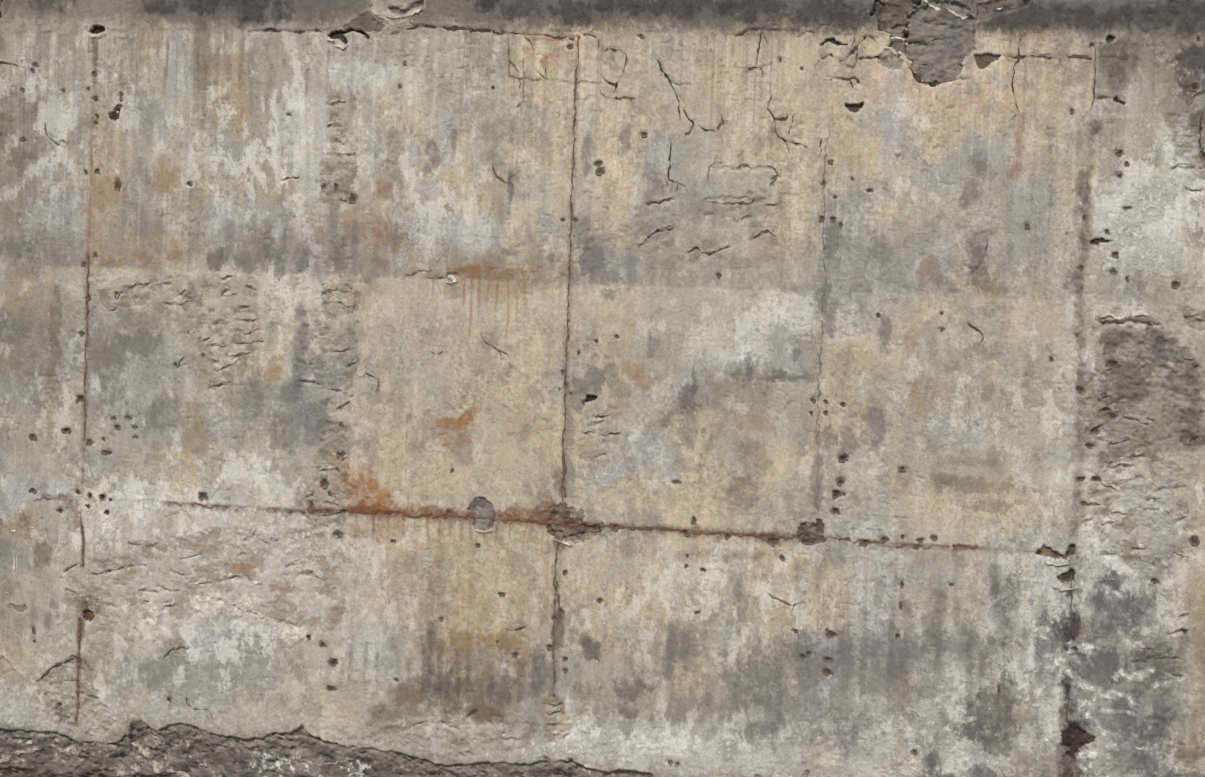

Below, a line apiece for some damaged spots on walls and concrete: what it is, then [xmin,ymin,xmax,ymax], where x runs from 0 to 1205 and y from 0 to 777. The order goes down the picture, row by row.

spalling [327,0,424,49]
crack [391,24,636,107]
crack [657,22,967,190]
spalling [871,0,1029,86]
crack [1175,75,1205,157]
crack [492,166,515,187]
spalling [1076,311,1204,583]
rust [325,474,470,519]
spalling [0,657,653,777]
spalling [1061,724,1096,758]